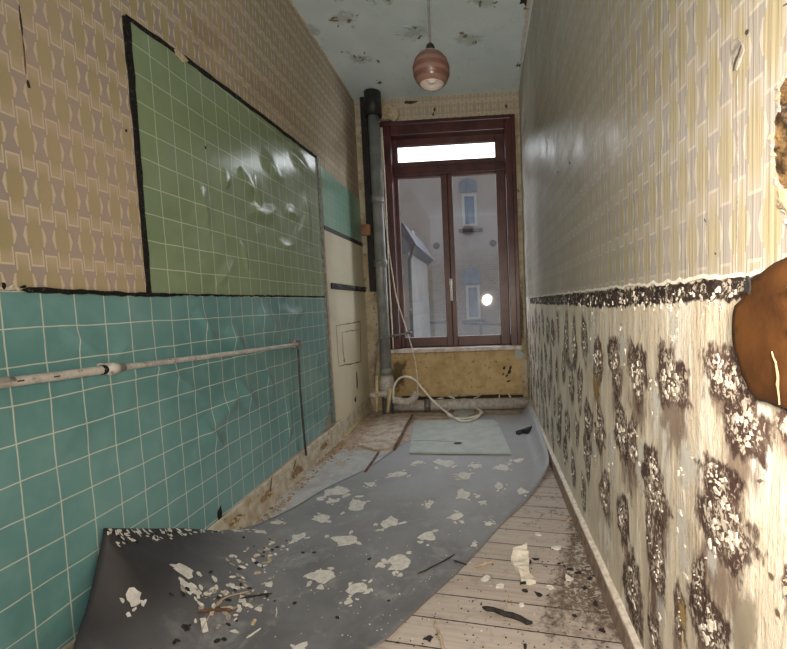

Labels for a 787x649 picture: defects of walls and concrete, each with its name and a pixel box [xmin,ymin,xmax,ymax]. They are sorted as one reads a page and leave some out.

spalling [767,72,787,224]
water stain [393,361,406,391]
peeling [554,396,663,512]
peeling [649,364,679,416]
peeling [676,441,696,486]
peeling [733,411,758,447]
peeling [704,462,739,576]
peeling [646,536,665,646]
peeling [676,504,716,646]